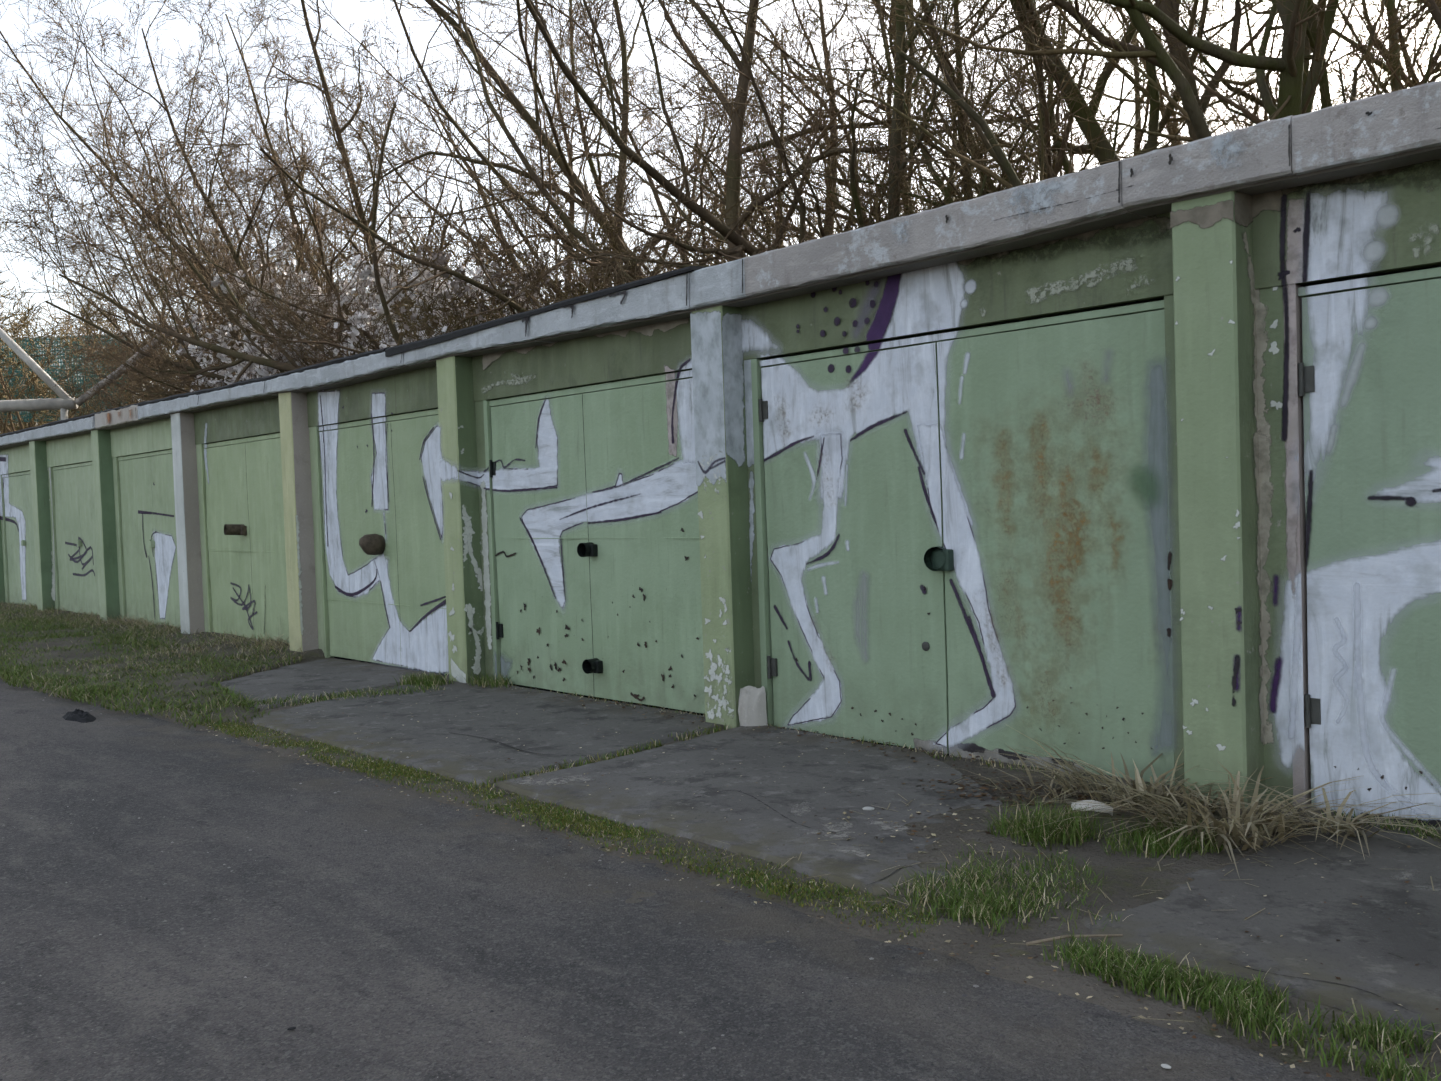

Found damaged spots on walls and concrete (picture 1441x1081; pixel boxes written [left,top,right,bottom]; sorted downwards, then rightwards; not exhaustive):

peeling [1409,224,1439,258]
peeling [1027,259,1149,303]
peeling [517,610,584,681]
peeling [694,597,734,720]